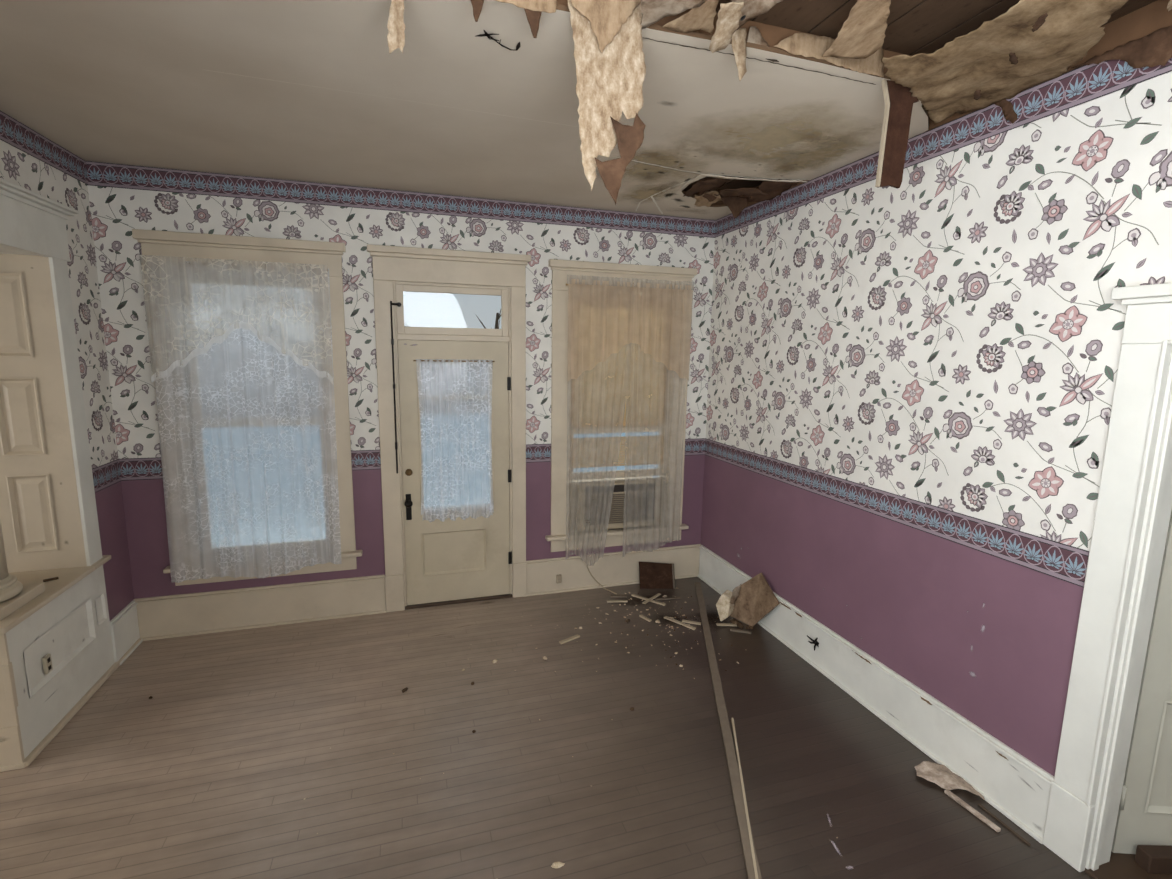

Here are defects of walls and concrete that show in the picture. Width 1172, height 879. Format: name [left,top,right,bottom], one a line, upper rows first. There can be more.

peeling [678,174,808,218]